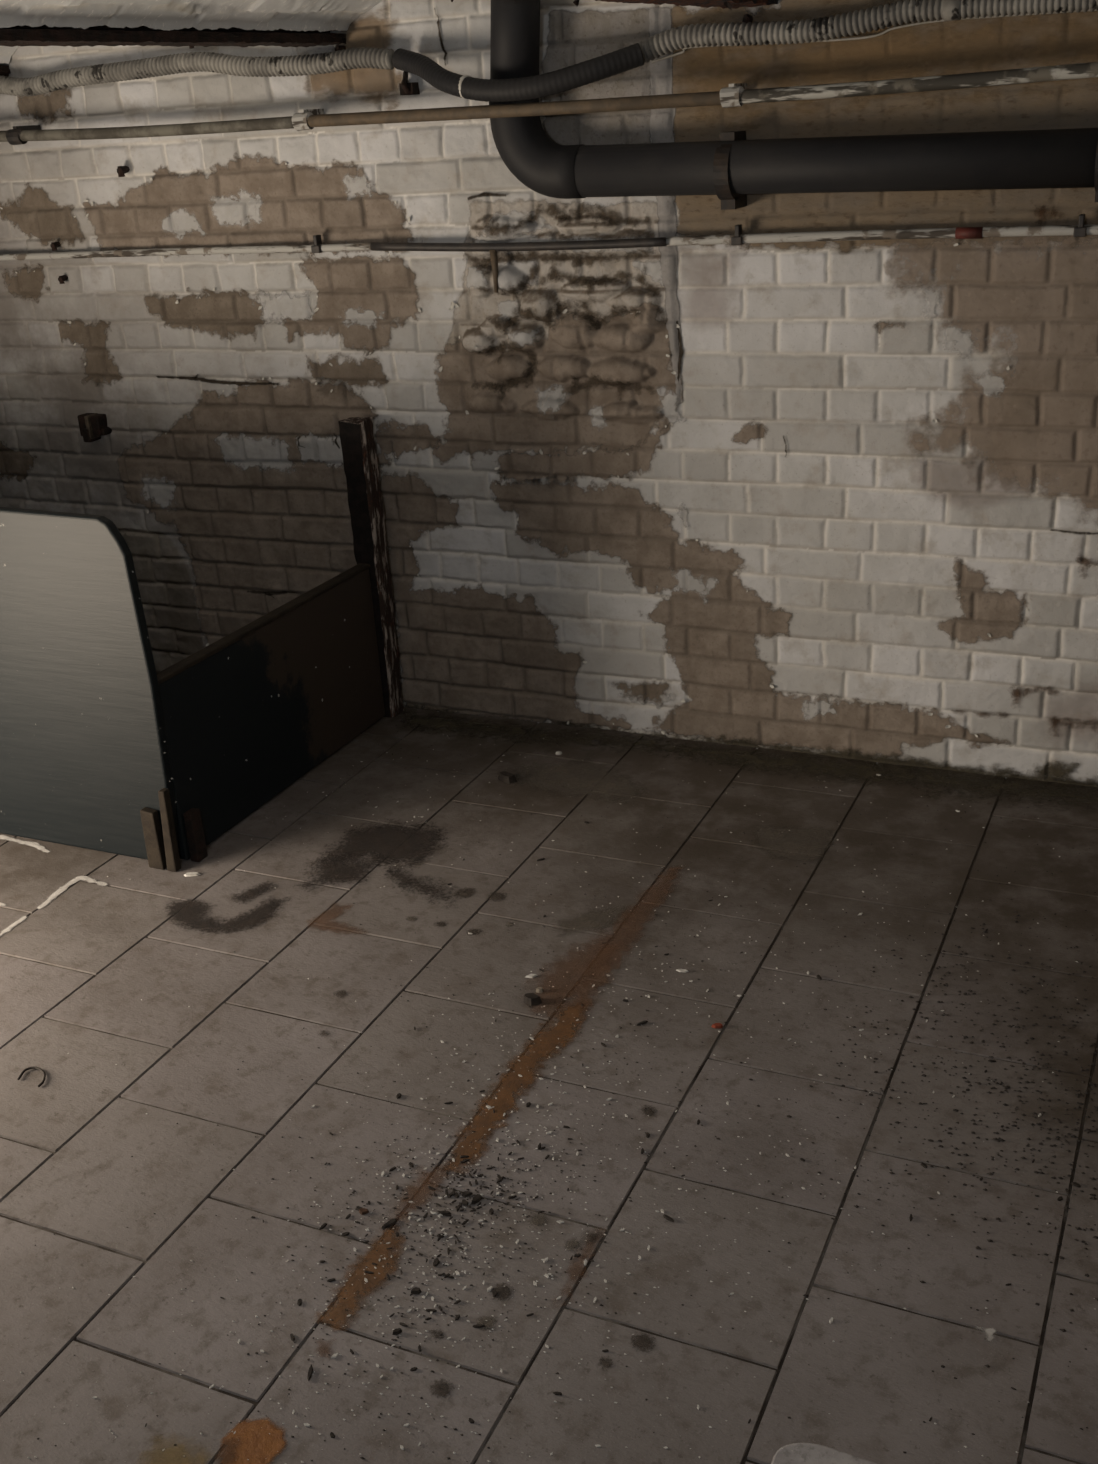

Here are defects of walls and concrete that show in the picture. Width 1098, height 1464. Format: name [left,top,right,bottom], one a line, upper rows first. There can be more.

peeling [0,154,1010,757]
peeling [938,560,1028,644]
corrosion [314,868,678,1330]
corrosion [217,1418,286,1464]